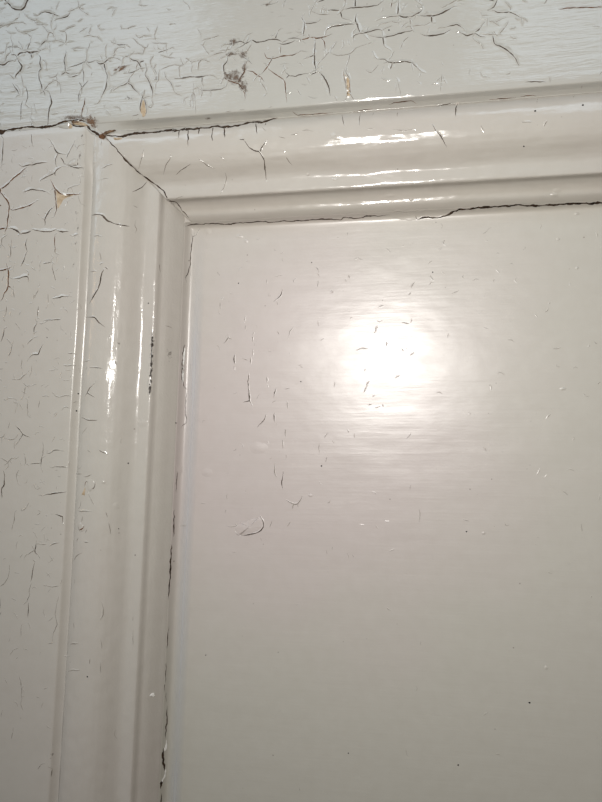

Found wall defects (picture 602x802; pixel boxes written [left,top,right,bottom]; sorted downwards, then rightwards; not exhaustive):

crack [544,0,602,27]
crack [408,200,602,296]
crack [160,628,169,802]